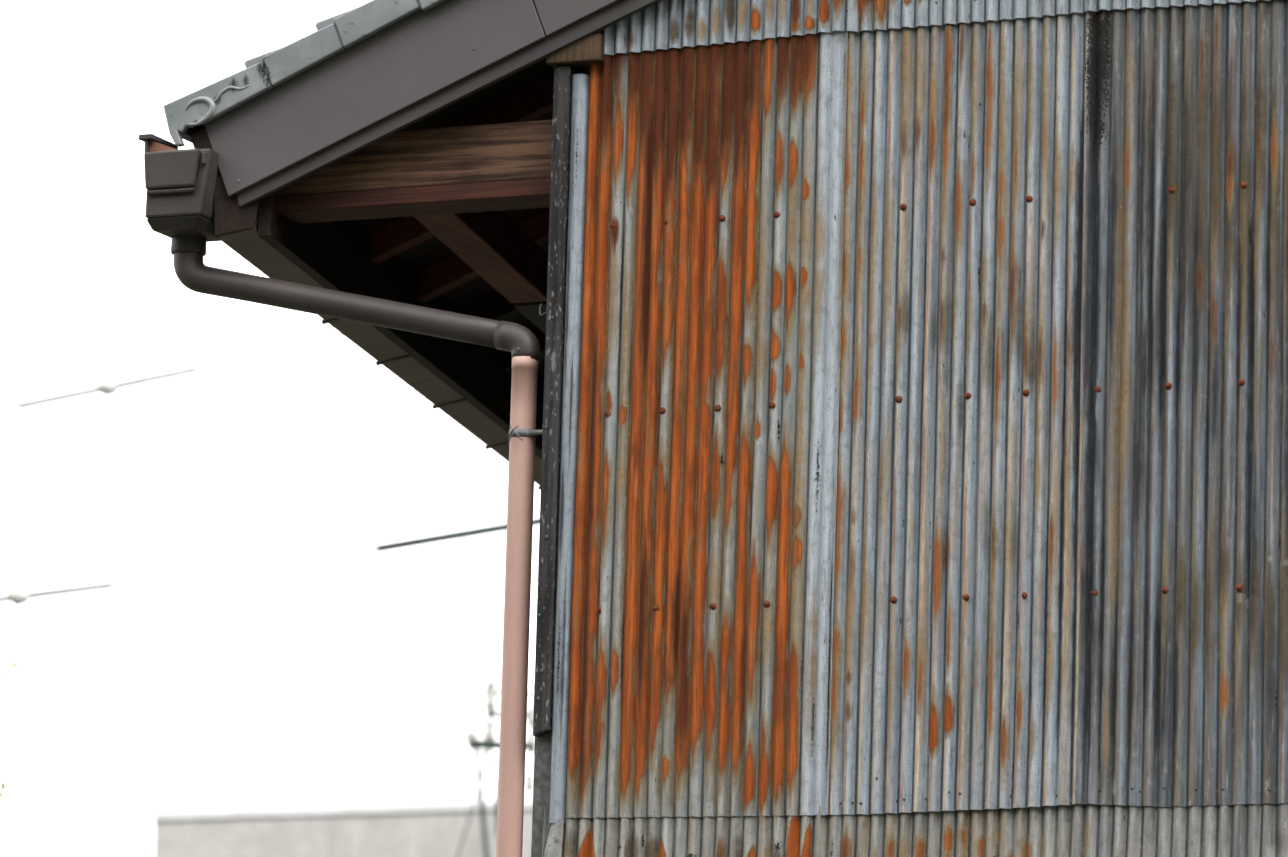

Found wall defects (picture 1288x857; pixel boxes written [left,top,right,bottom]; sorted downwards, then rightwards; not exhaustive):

corrosion [562,0,926,857]
corrosion [943,824,1043,857]